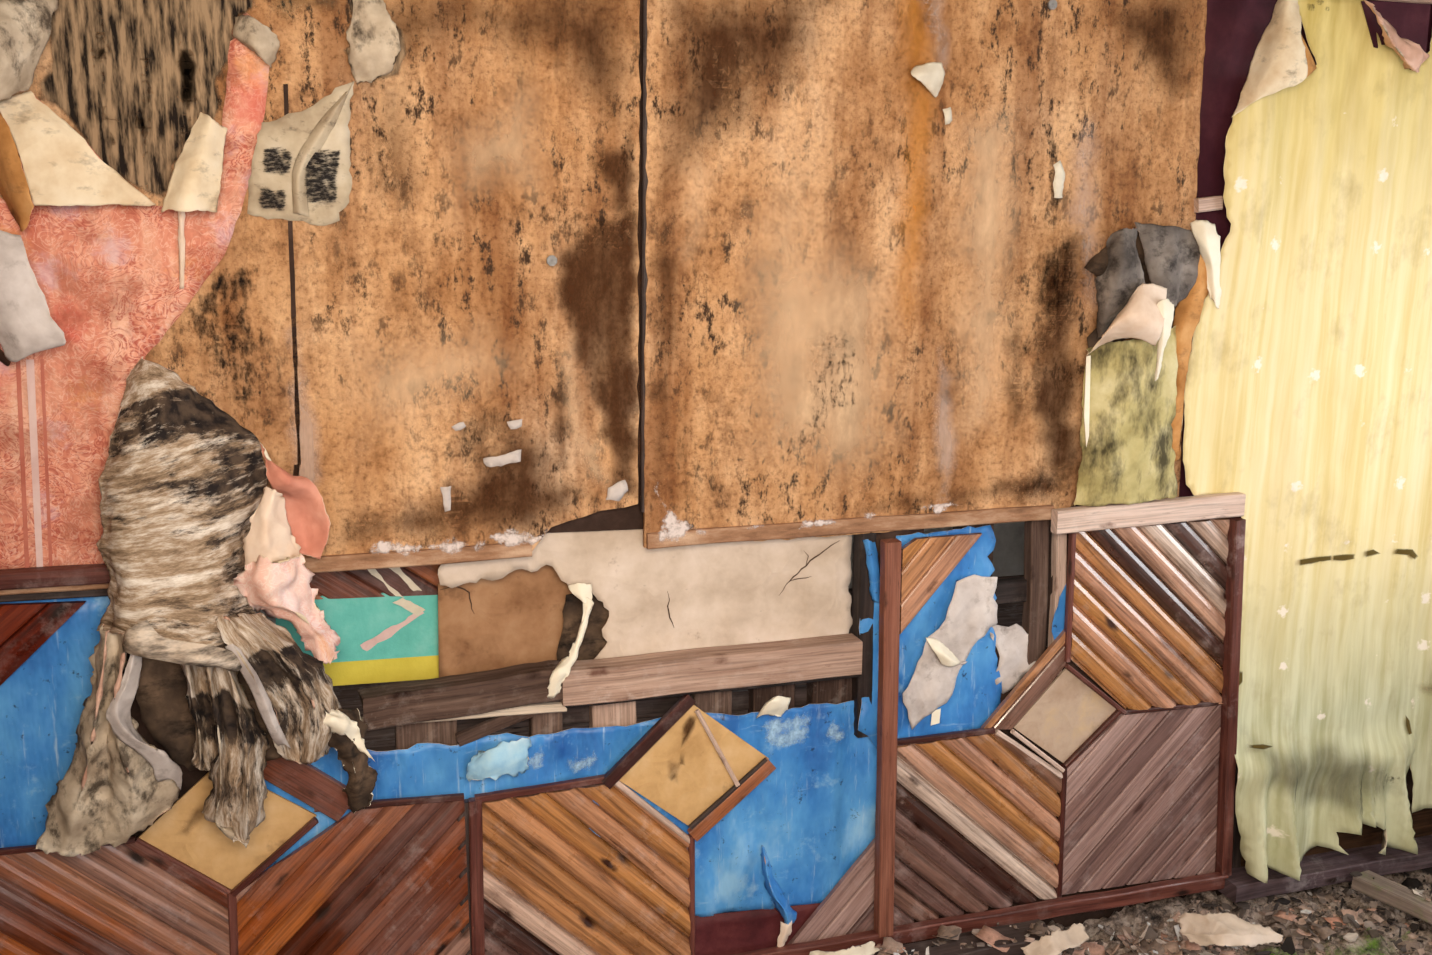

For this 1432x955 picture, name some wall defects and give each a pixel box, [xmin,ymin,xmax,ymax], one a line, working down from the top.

leakage [689,9,794,128]
peeling [1231,0,1308,118]
peeling [0,0,228,366]
leakage [562,151,637,492]
leakage [1014,243,1074,496]
peeling [547,597,594,699]
peeling [926,638,968,667]
peeling [931,709,941,725]